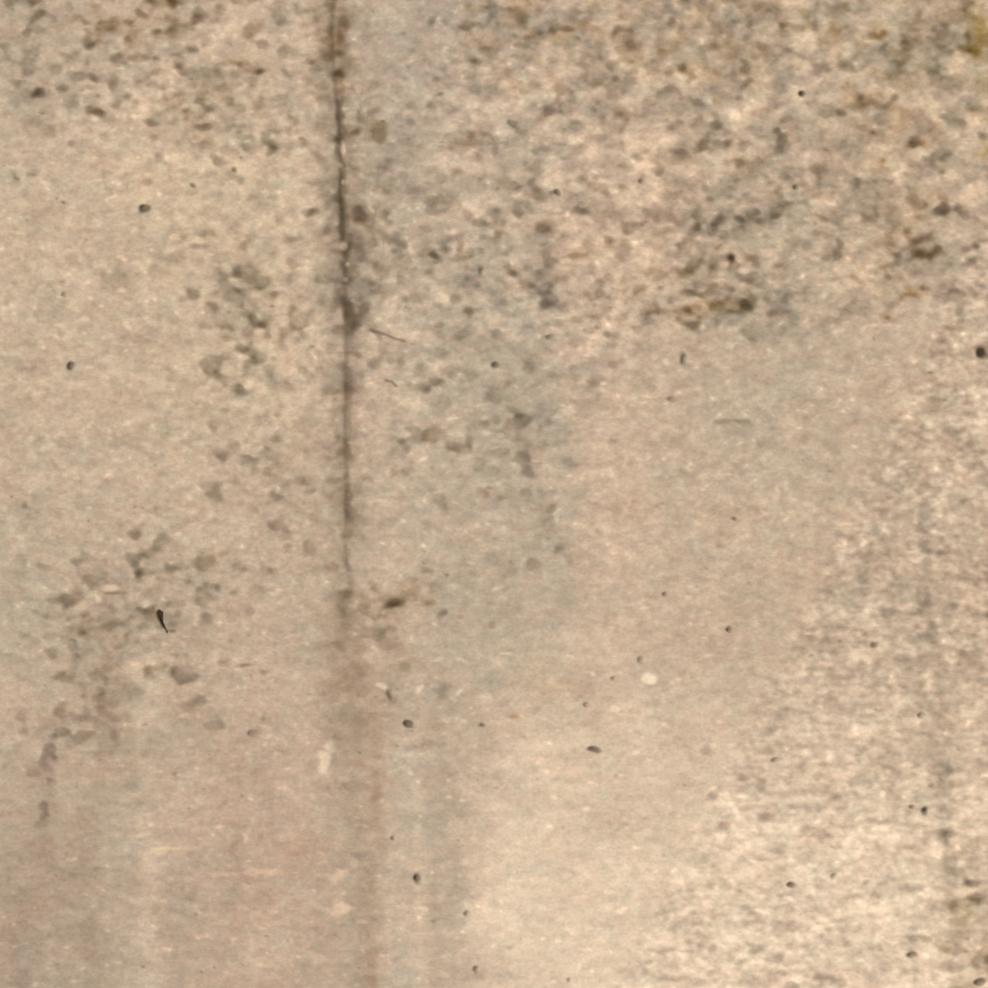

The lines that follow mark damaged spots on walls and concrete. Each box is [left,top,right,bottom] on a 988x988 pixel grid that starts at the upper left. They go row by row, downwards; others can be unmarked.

crack [293,0,407,692]